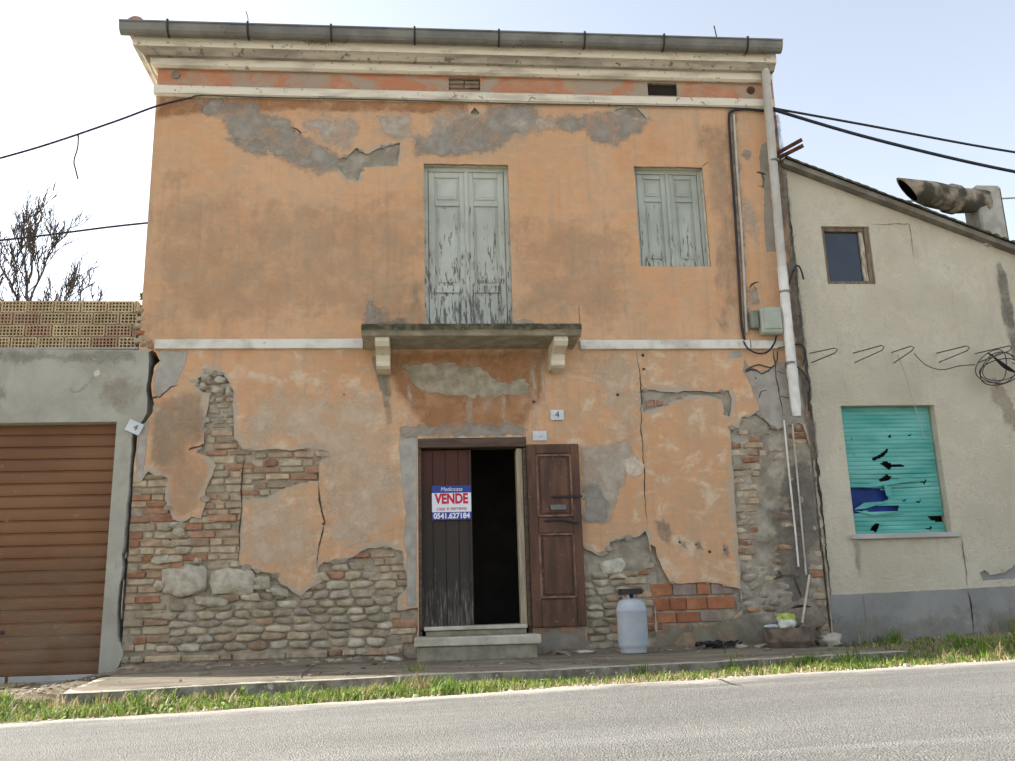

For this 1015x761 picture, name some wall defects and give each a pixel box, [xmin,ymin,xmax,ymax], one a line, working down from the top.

peeling [200,99,648,181]
peeling [401,362,536,403]
crack [636,350,647,517]
spalling [120,365,422,667]
crack [317,484,328,561]
spalling [582,388,831,649]
spalling [980,565,1015,581]